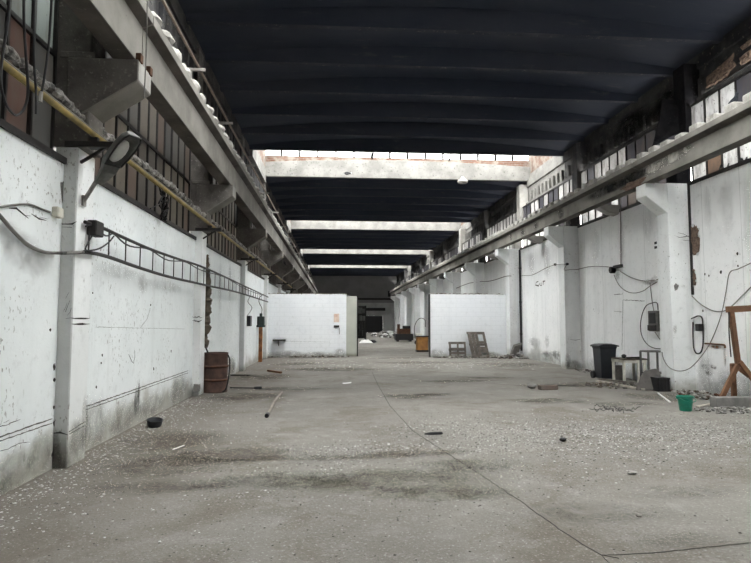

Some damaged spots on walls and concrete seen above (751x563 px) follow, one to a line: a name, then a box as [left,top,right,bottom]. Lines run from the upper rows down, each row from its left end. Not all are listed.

spalling [706,39,751,88]
spalling [691,224,700,256]